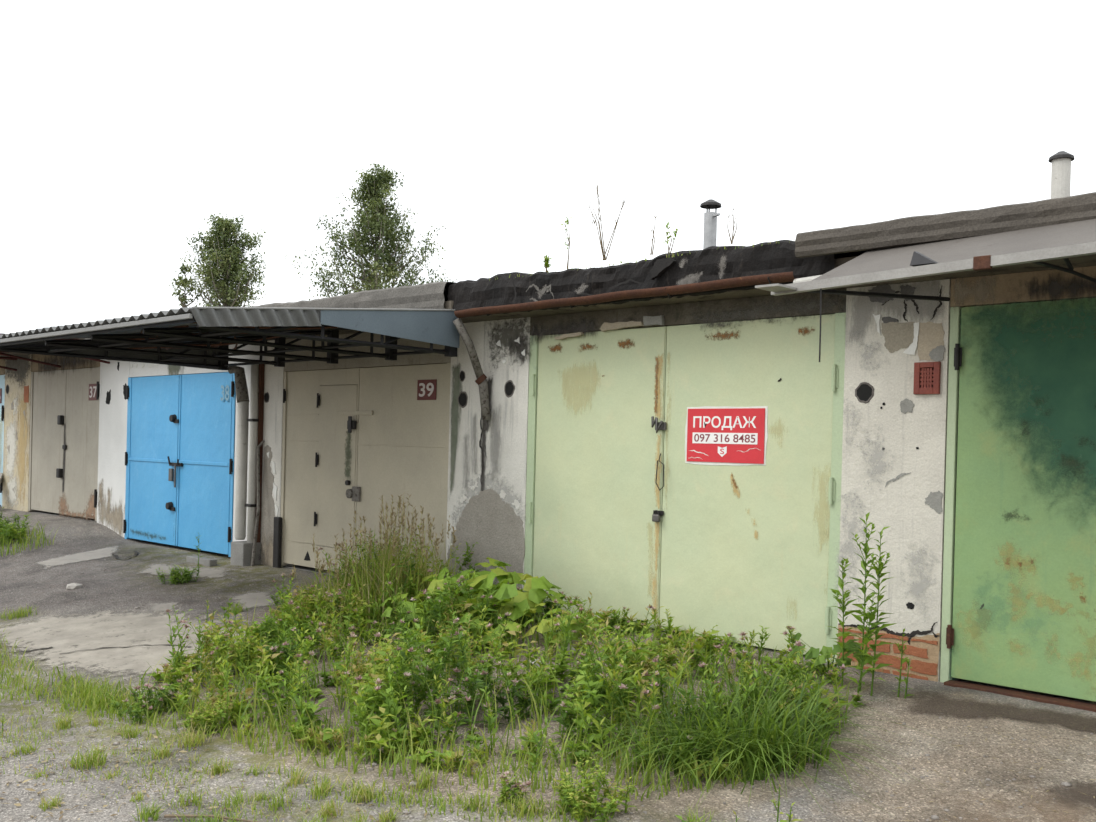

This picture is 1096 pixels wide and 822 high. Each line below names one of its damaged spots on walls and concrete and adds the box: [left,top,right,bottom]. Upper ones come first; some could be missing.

damp [1028,276,1096,301]
peeling [488,317,530,368]
flaking render [857,282,942,355]
corrosion [654,355,663,418]
flaking render [837,625,940,682]